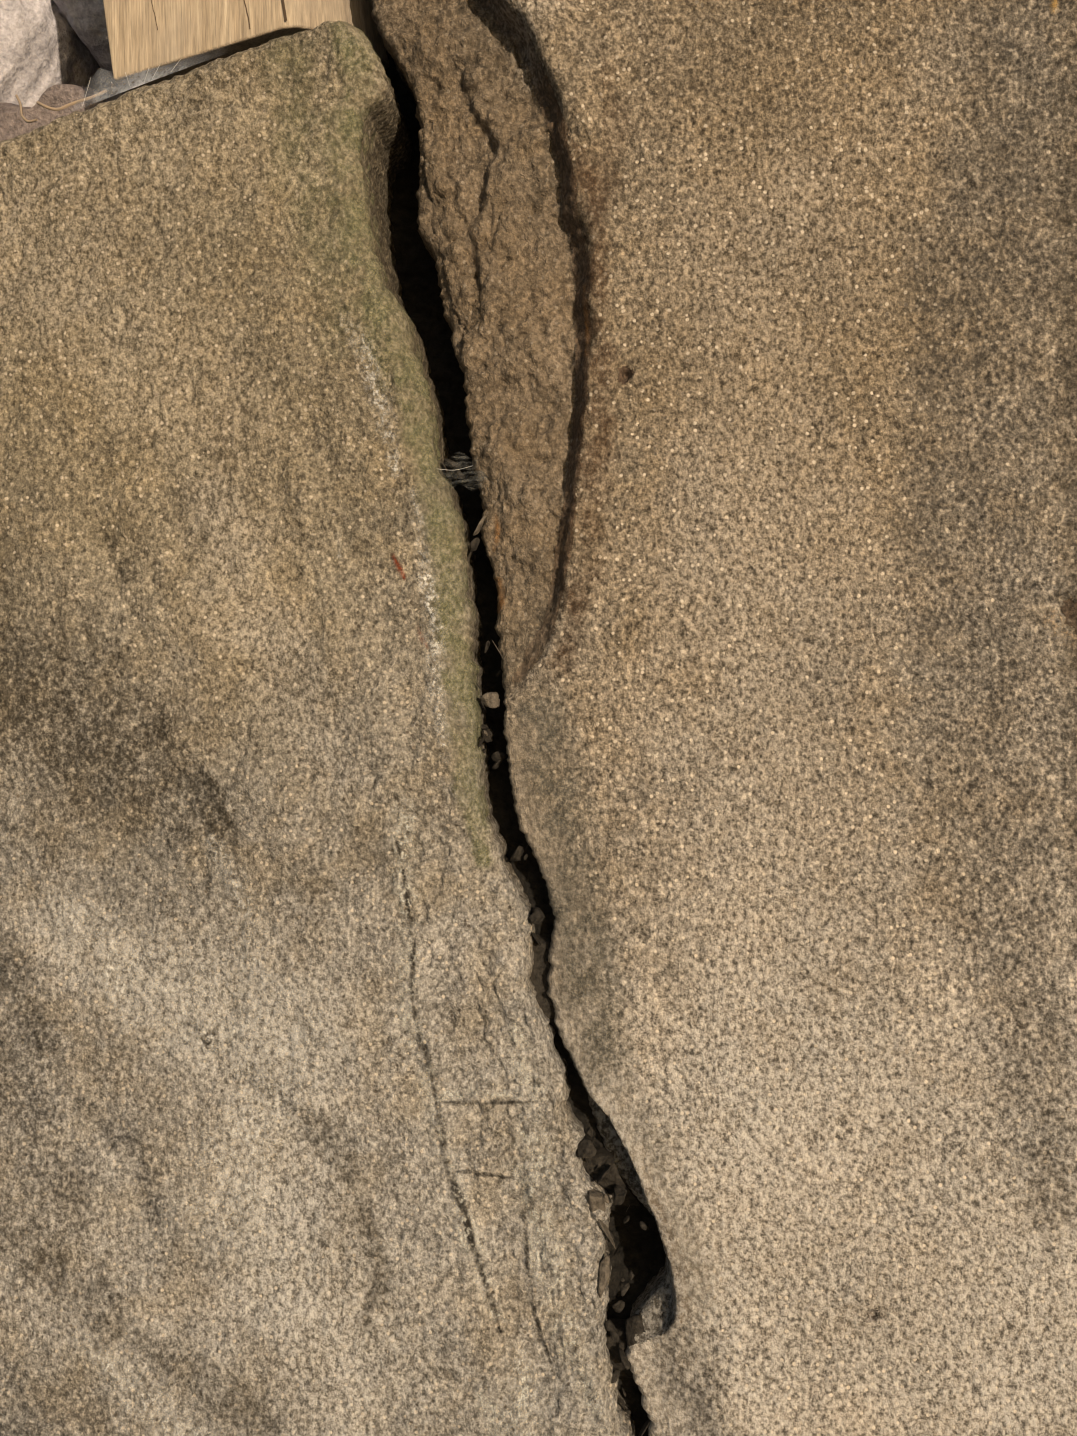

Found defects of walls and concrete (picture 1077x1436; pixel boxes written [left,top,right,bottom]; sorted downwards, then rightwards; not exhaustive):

crack [384,49,666,1436]